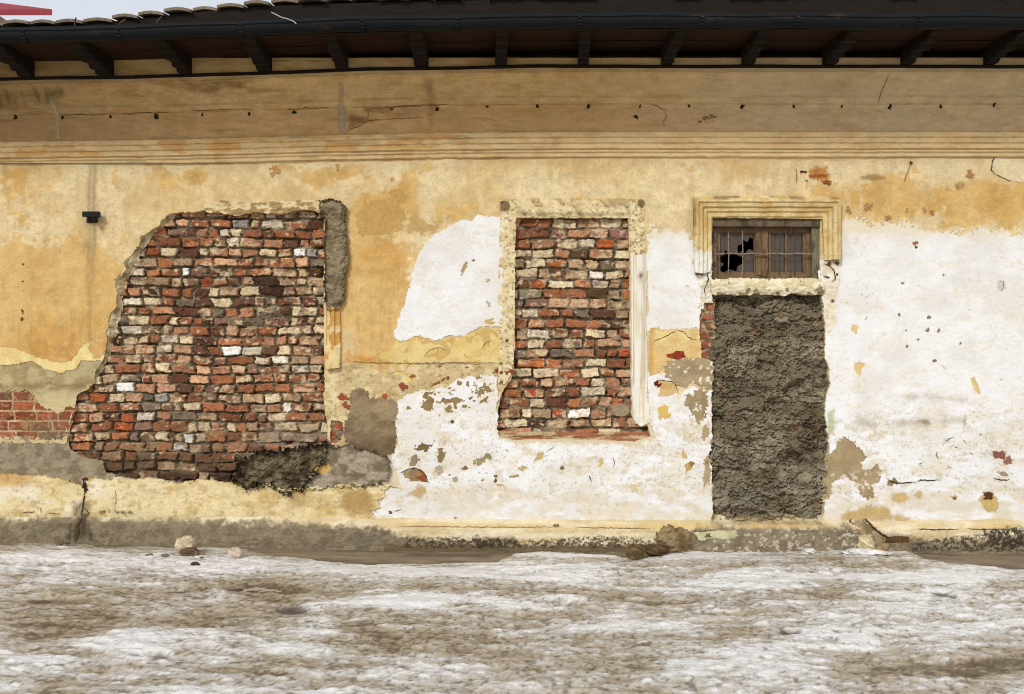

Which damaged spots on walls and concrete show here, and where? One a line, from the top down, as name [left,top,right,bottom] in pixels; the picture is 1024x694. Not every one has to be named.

spalling [822,260,840,335]
flaking render [0,211,514,488]
peeling [648,266,716,441]
peeling [481,452,543,486]
peeling [681,449,712,487]
peeling [821,436,882,502]
spalling [979,491,998,512]
peeling [993,450,1014,481]